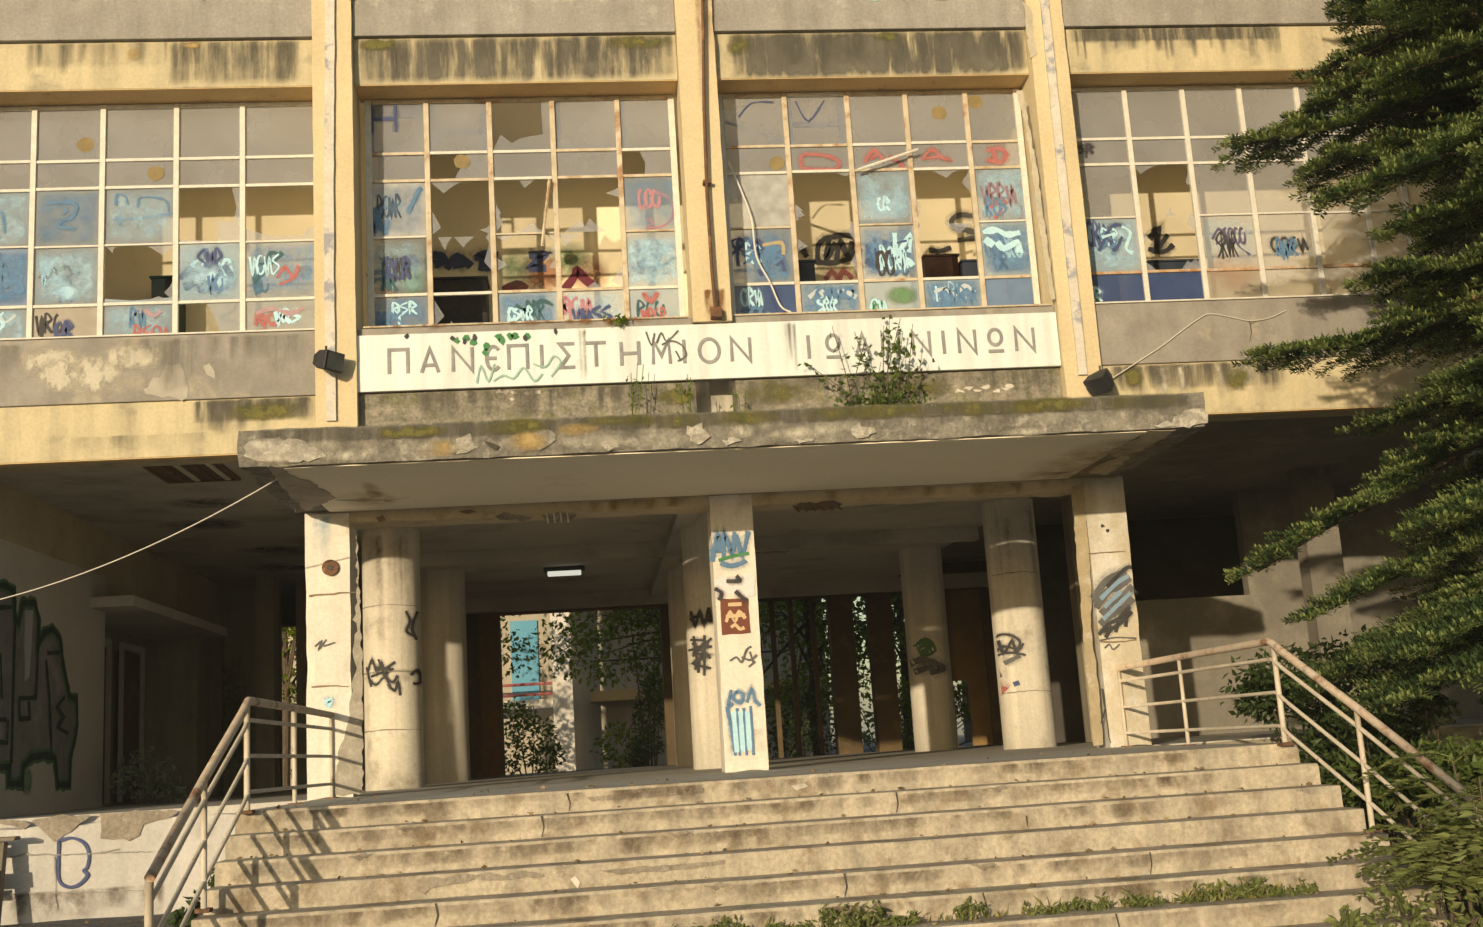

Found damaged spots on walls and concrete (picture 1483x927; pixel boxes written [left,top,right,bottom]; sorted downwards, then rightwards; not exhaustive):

water stain [1075,27,1276,49]
water stain [361,37,670,80]
water stain [730,32,1022,76]
peeling [25,345,188,401]
peeling [203,364,215,378]
spalling [456,434,500,454]
spalling [521,429,556,450]
spalling [599,441,619,451]
spalling [687,423,742,446]
spalling [851,422,876,439]